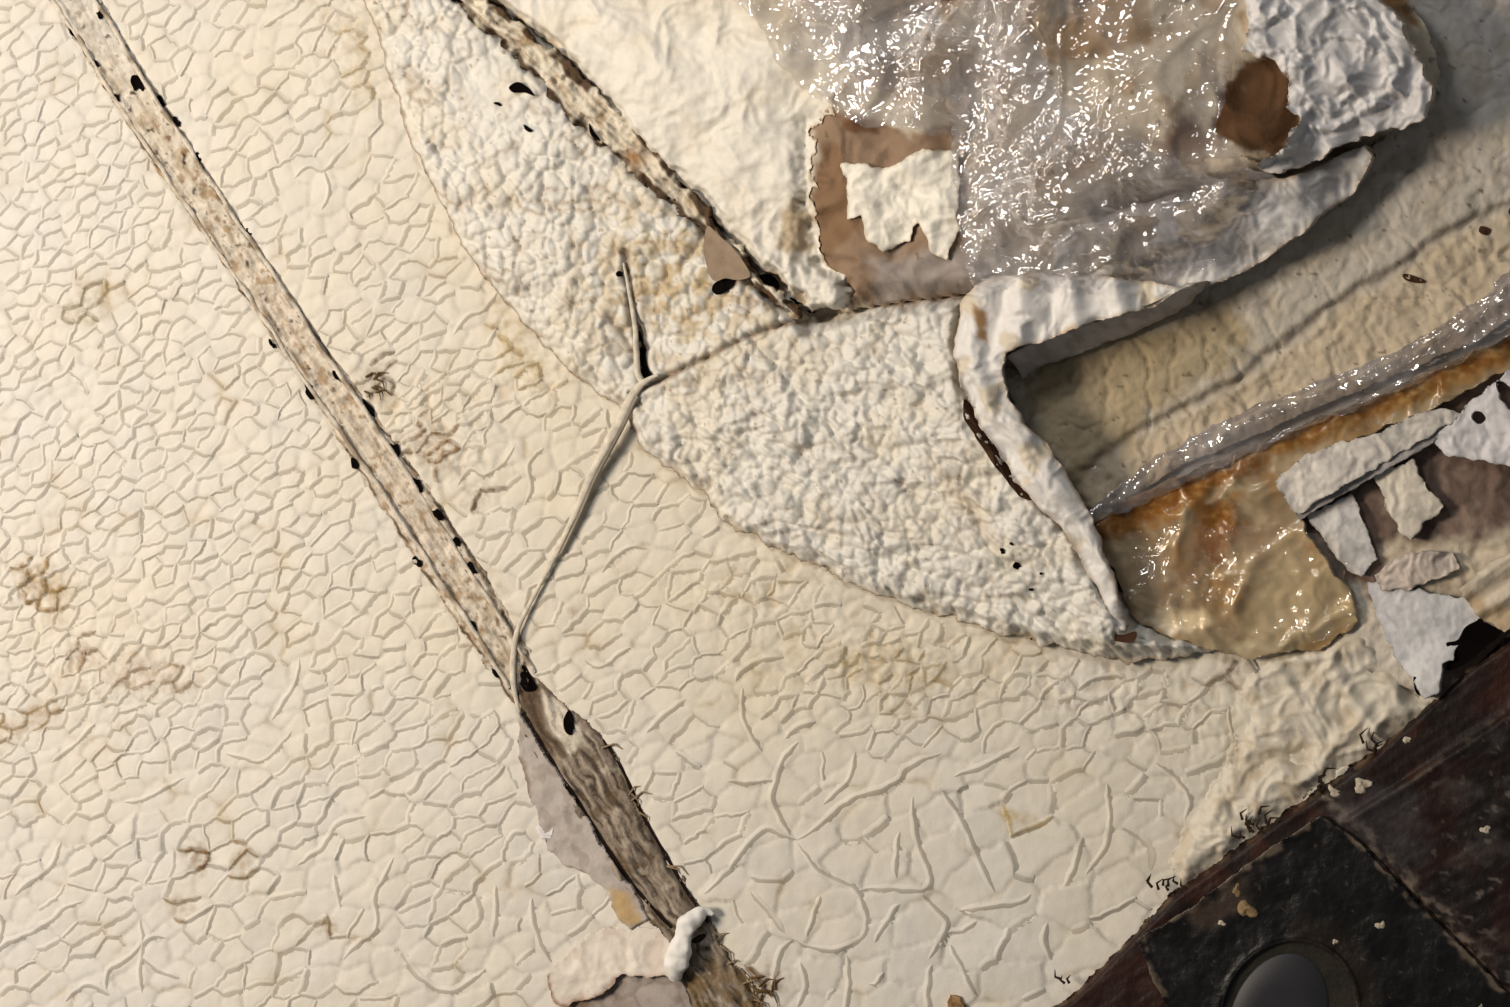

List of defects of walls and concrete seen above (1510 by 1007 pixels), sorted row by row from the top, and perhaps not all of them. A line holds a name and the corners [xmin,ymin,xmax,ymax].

crack [0,0,611,1007]
peeling [517,713,693,1007]
crack [113,0,1241,1007]
peeling [1276,369,1510,700]